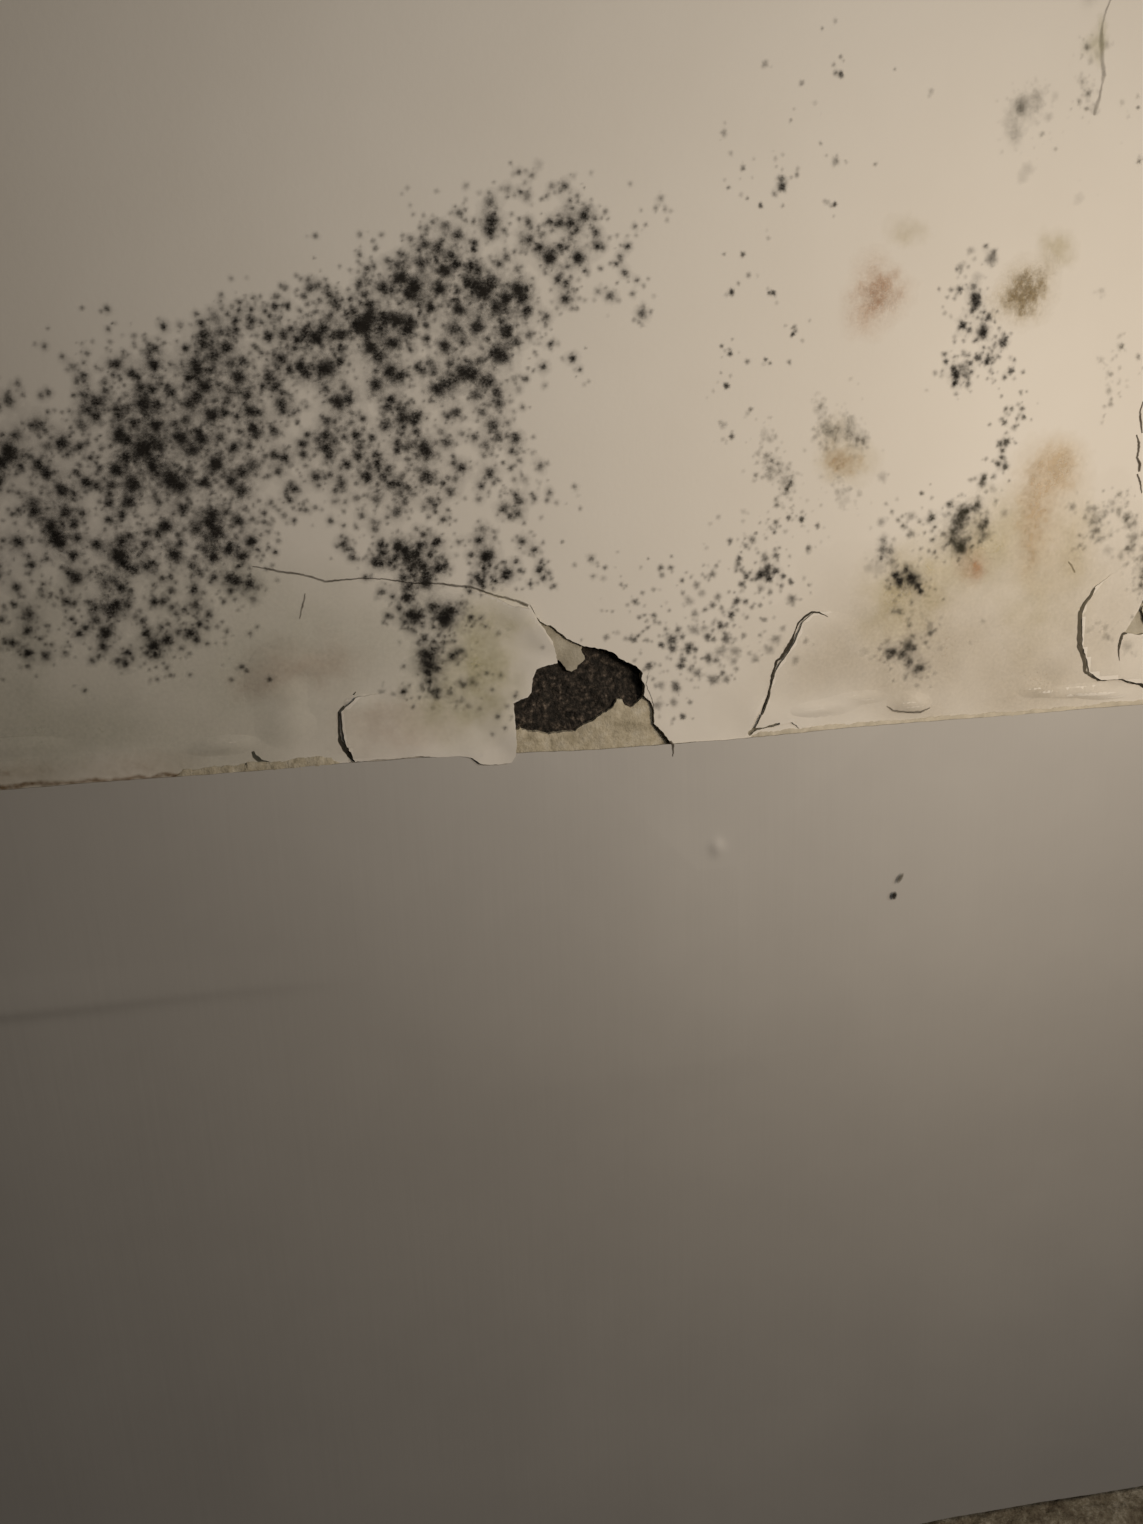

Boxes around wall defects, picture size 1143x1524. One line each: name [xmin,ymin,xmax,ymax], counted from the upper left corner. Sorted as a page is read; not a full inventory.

leakage [944,286,1007,386]
leakage [0,185,638,698]
crack [338,692,356,761]
crack [253,566,528,619]
peeling [174,563,1143,777]
leakage [660,540,793,690]
crack [748,611,826,735]
leakage [892,567,923,597]
leakage [929,503,988,552]
crack [1068,561,1143,688]